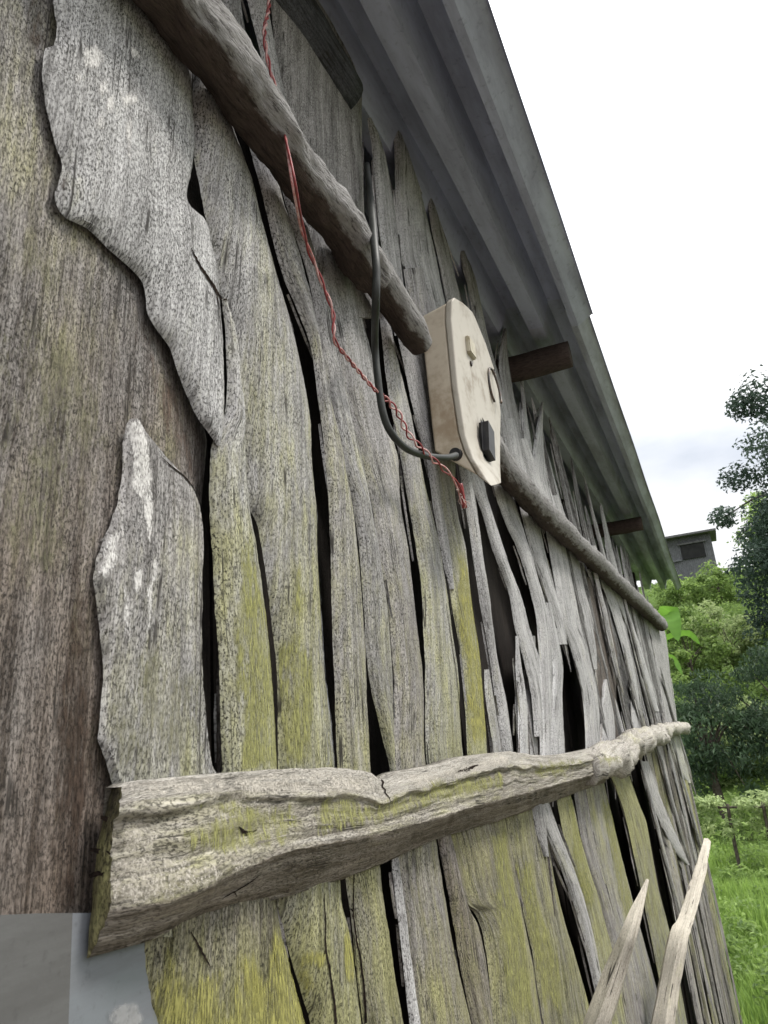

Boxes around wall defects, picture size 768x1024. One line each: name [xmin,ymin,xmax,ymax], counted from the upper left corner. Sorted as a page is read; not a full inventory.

crack [191,932,211,967]